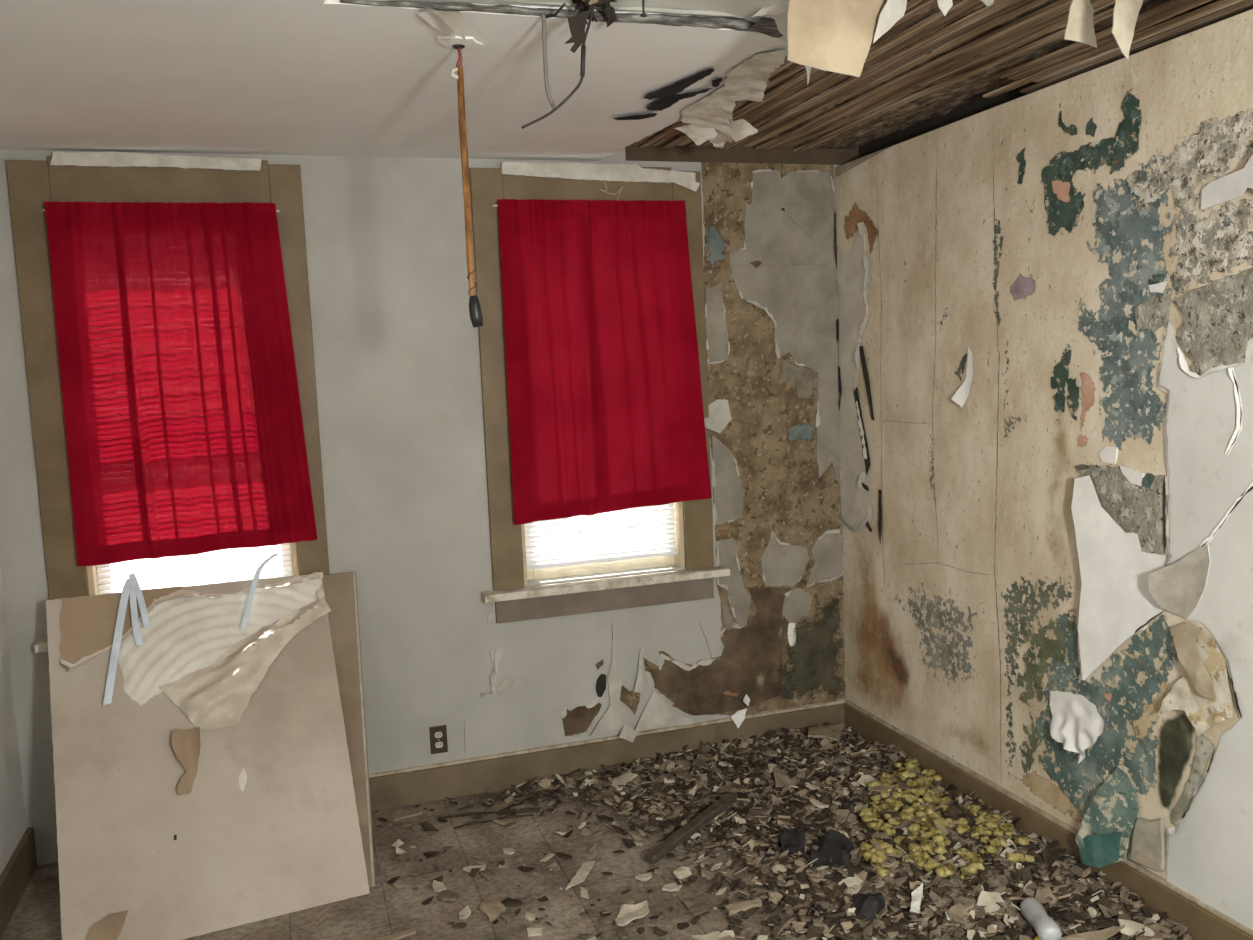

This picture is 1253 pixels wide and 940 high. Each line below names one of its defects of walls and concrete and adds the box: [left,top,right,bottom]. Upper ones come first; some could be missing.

spalling [340,0,789,50]
peeling [560,9,1253,880]
crack [1225,367,1243,455]
crack [1186,482,1253,556]
leakage [646,532,996,772]